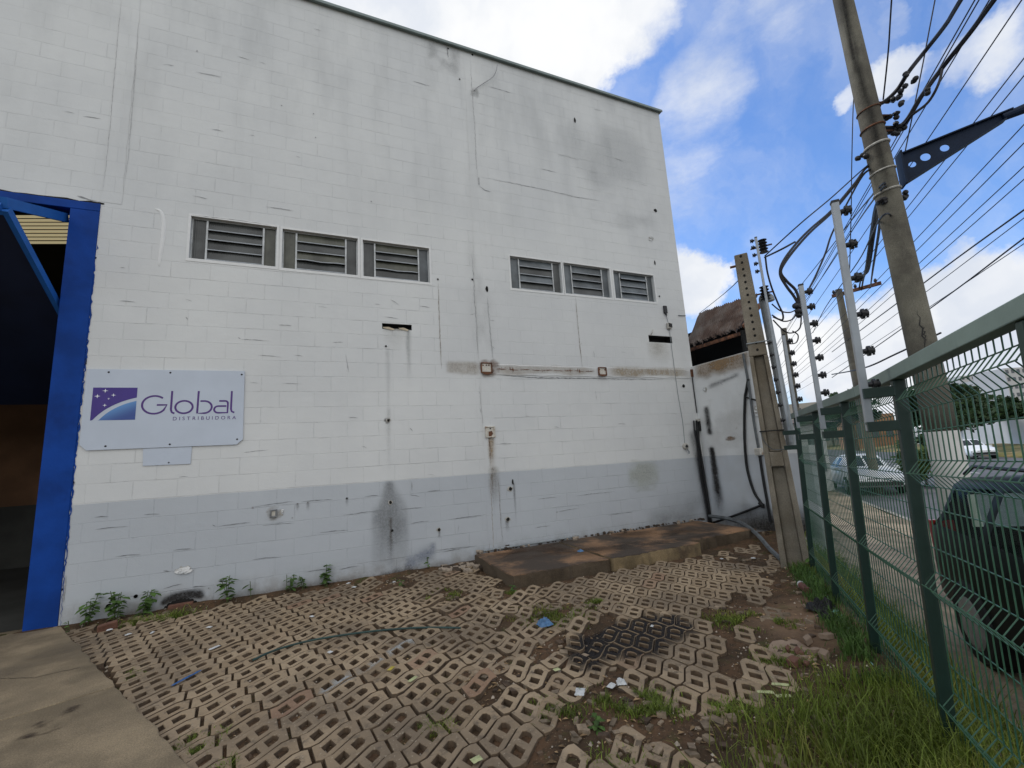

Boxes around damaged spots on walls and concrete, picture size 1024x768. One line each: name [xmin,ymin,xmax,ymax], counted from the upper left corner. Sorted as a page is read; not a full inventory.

rust [616,368,677,376]